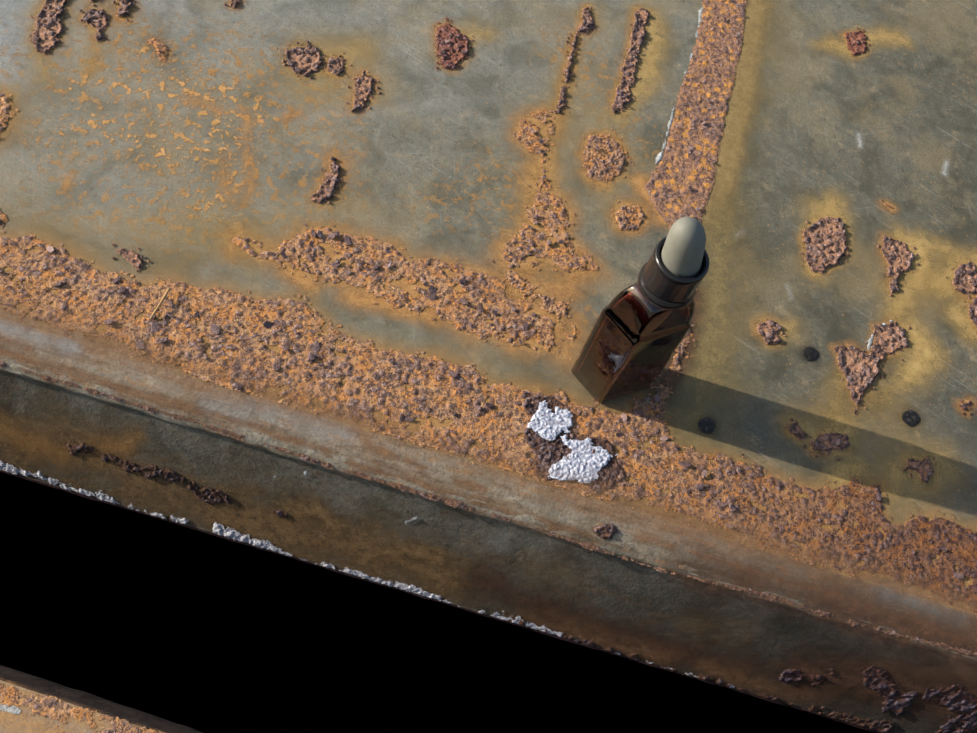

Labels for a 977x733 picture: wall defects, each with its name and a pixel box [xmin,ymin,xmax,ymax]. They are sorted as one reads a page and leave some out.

rust [0,93,19,133]
rust [28,0,382,234]
rust [0,212,594,497]
rust [227,5,601,360]
rust [551,0,977,615]
rust [0,421,977,733]